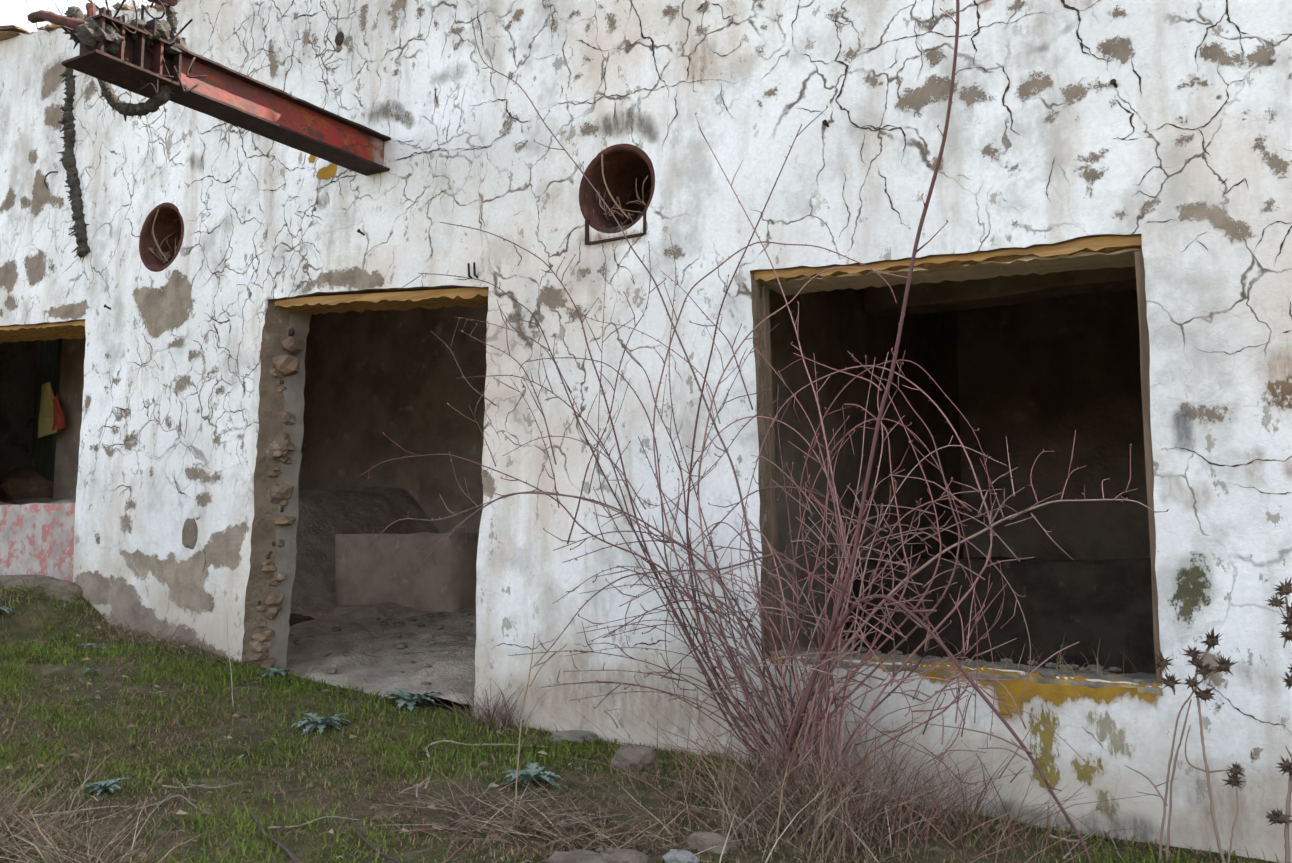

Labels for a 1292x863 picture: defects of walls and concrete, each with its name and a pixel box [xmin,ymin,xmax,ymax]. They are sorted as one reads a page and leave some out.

crack [249,0,393,107]
crack [394,0,1285,237]
peeling [0,249,89,327]
crack [97,102,358,451]
crack [1132,166,1208,251]
crack [1198,302,1292,355]
crack [1251,221,1292,266]
spalling [74,265,489,668]
crack [1171,447,1291,495]
leakage [1170,553,1211,625]